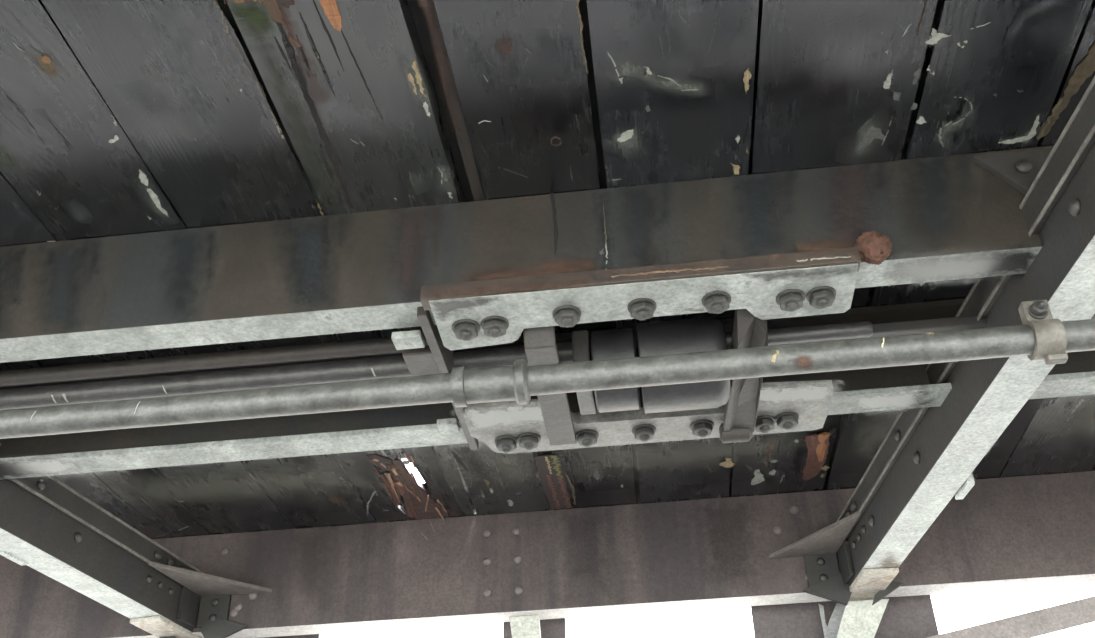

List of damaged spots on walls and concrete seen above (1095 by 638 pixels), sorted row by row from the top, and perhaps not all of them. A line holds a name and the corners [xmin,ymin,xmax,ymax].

peeling [319,0,342,31]
peeling [924,22,991,48]
peeling [408,59,431,117]
peeling [608,53,703,93]
peeling [883,70,901,101]
peeling [855,115,893,155]
peeling [938,97,972,149]
peeling [998,114,1040,144]
peeling [139,170,169,220]
rust [797,230,892,265]
rust [611,266,729,277]
rust [435,281,587,299]